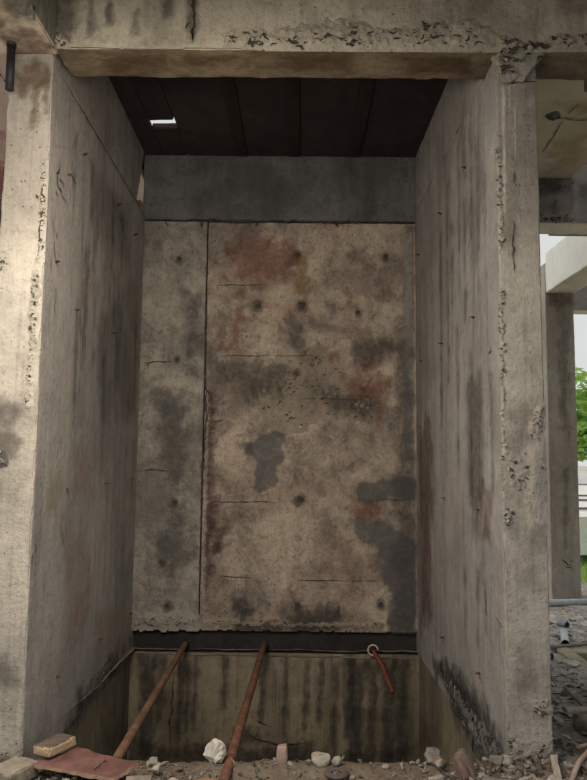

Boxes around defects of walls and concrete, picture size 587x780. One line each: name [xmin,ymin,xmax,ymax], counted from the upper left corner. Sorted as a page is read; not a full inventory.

crack [185,0,196,43]
spalling [222,15,587,84]
crack [542,103,587,152]
crack [509,220,517,273]
damp [129,632,206,763]
damp [341,656,409,763]
damp [434,662,498,745]
damp [235,734,277,762]
damp [288,747,312,760]